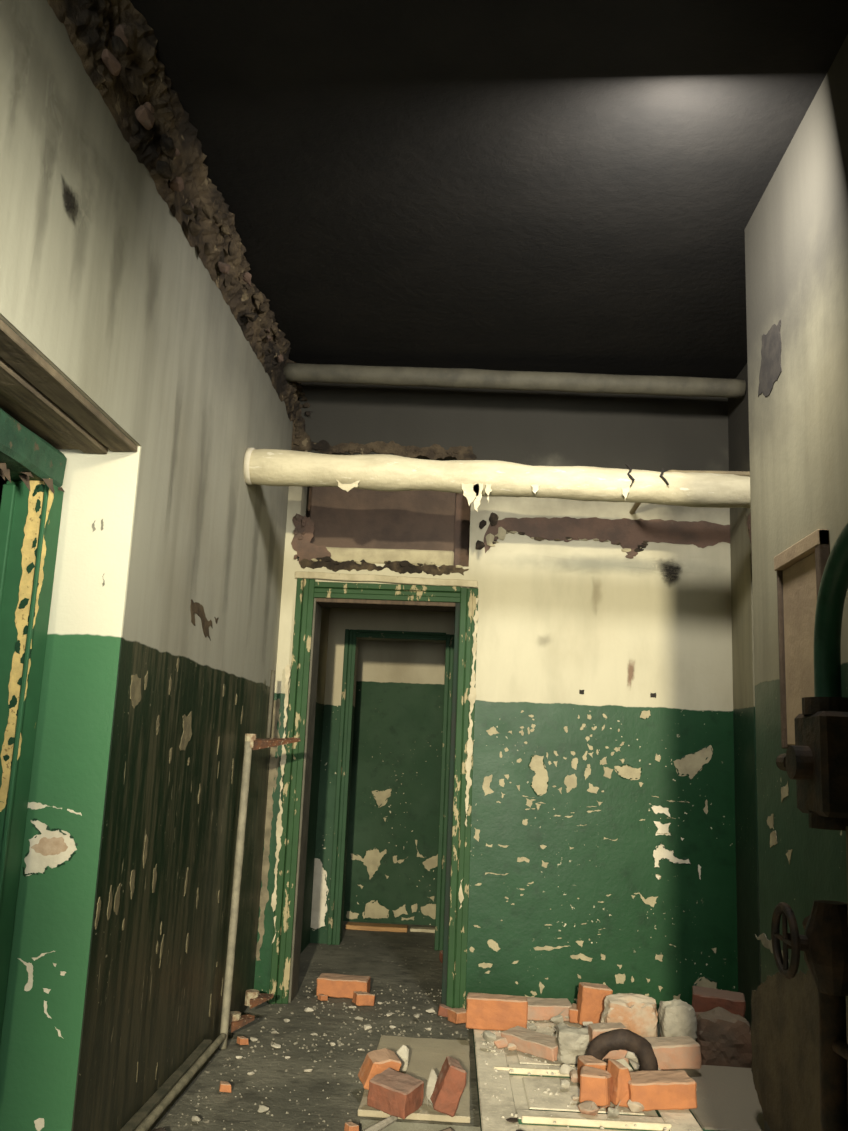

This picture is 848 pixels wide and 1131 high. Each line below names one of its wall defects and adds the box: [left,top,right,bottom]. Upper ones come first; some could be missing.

spalling [47,0,477,460]
spalling [291,513,469,576]
peeling [0,478,54,812]
peeling [465,598,643,848]
peeling [655,745,714,781]
peeling [22,818,78,877]
peeling [256,665,291,961]
peeling [310,858,329,930]
peeling [351,848,404,889]
peeling [346,896,436,920]
peeling [639,796,701,880]
spalling [534,923,681,1000]